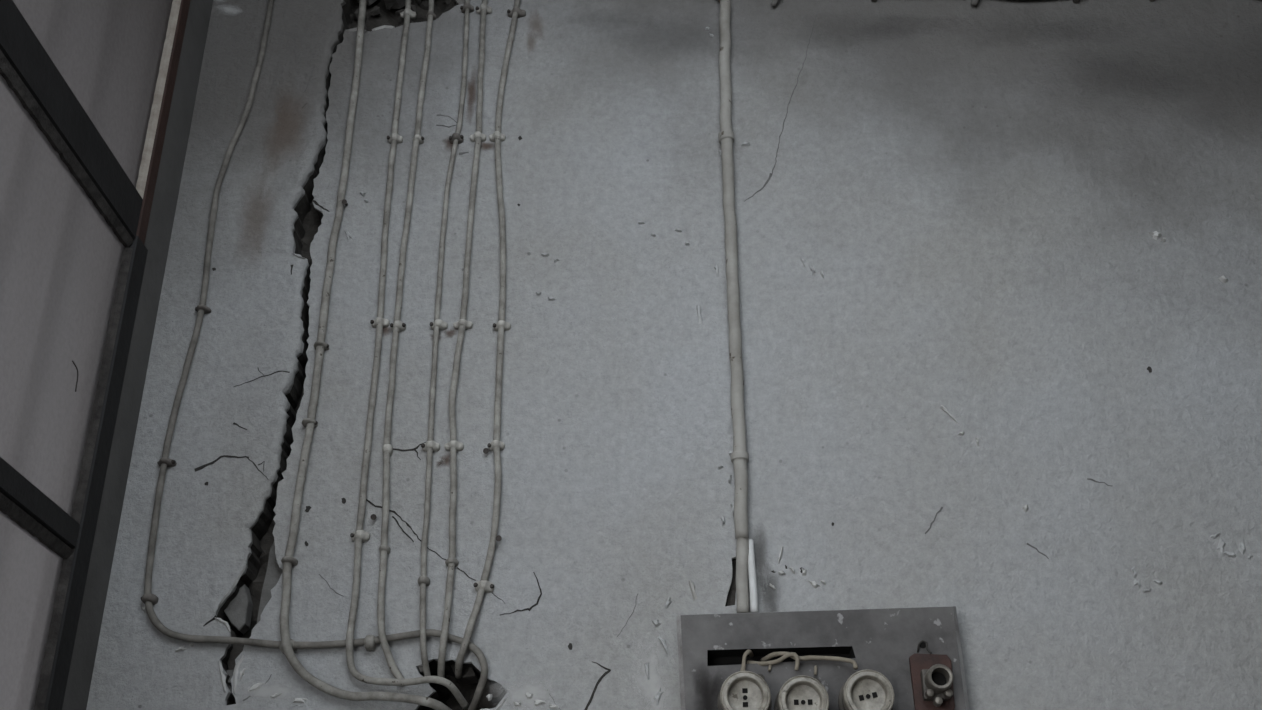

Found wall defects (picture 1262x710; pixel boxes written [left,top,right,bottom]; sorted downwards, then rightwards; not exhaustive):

crack [194,0,354,705]
spalling [342,0,471,33]